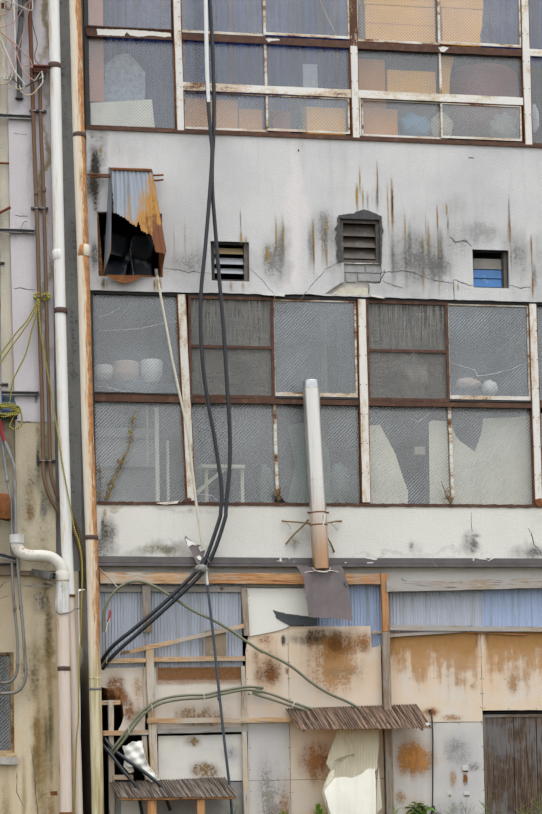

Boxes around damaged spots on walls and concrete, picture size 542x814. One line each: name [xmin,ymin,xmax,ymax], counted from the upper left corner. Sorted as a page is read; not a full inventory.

corrosion [376,170,393,224]
flaking render [326,263,385,299]
crack [370,270,470,299]